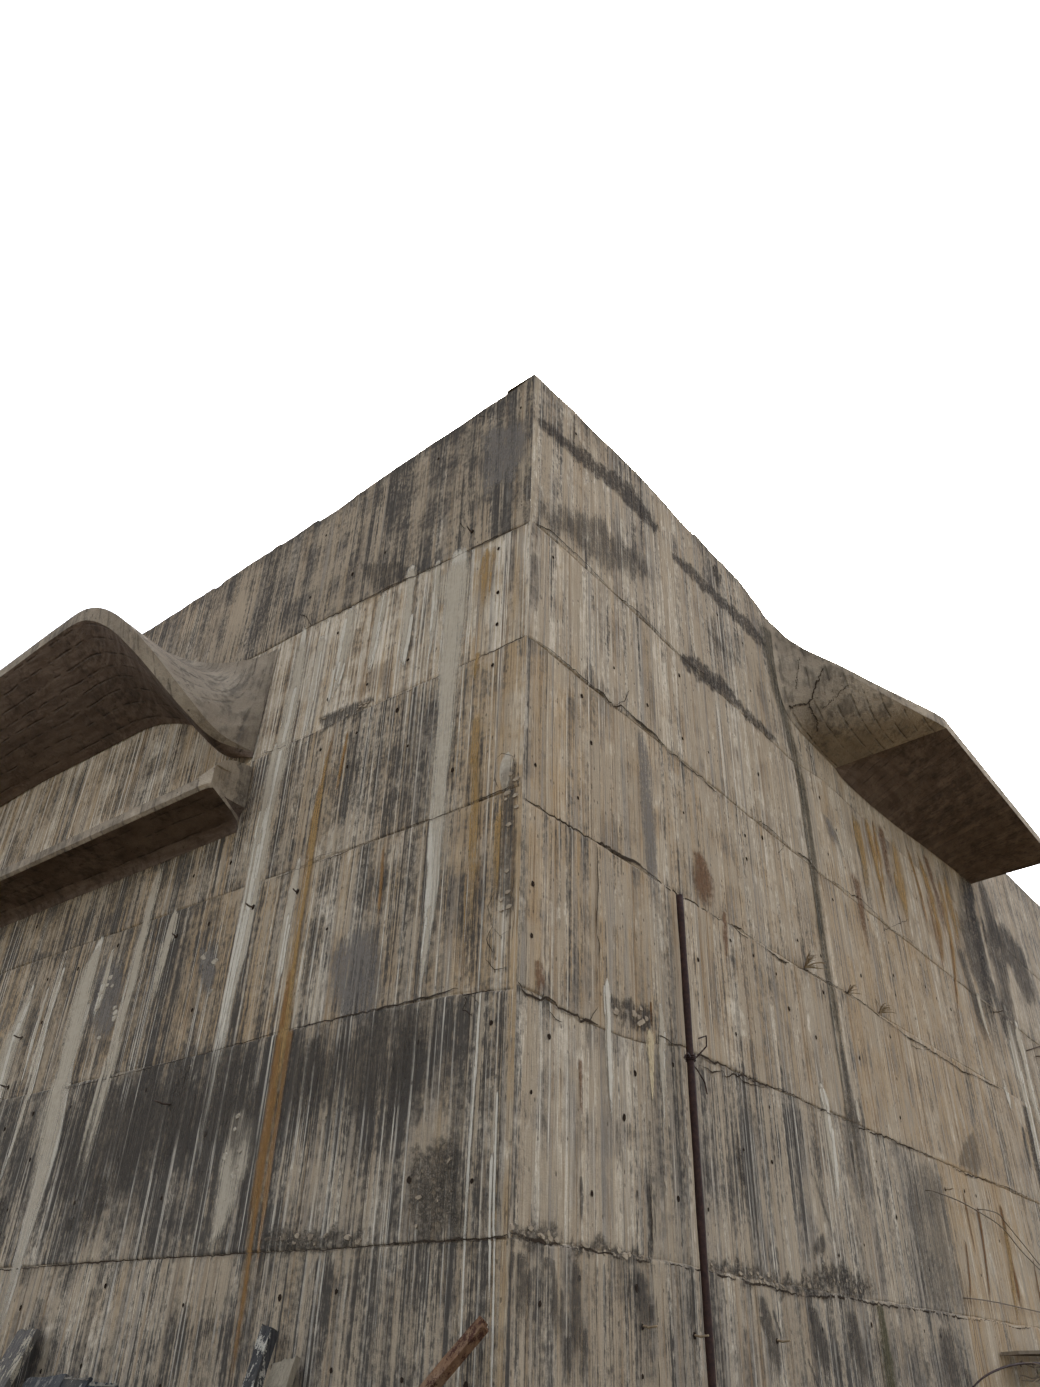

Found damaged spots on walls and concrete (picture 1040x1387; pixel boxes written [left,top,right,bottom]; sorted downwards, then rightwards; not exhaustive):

damp [484,415,659,580]
damp [0,608,356,1314]
corrosion [233,734,348,1370]
damp [275,929,427,1123]
damp [362,549,470,984]
corrosion [693,852,728,956]
damp [953,875,1040,1184]